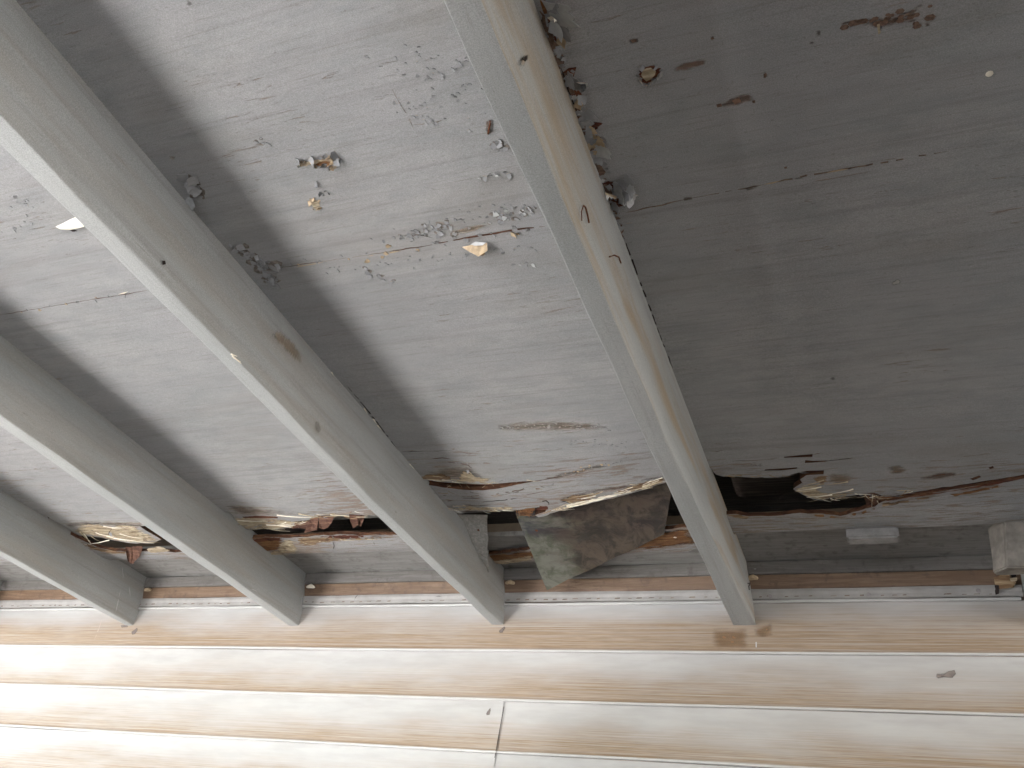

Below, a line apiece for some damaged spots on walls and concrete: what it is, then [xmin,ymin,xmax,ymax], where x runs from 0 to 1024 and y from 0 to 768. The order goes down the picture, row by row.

rust [840,4,936,35]
peeling [295,151,342,210]
peeling [539,0,673,368]
crack [625,151,946,213]
peeling [228,201,545,290]